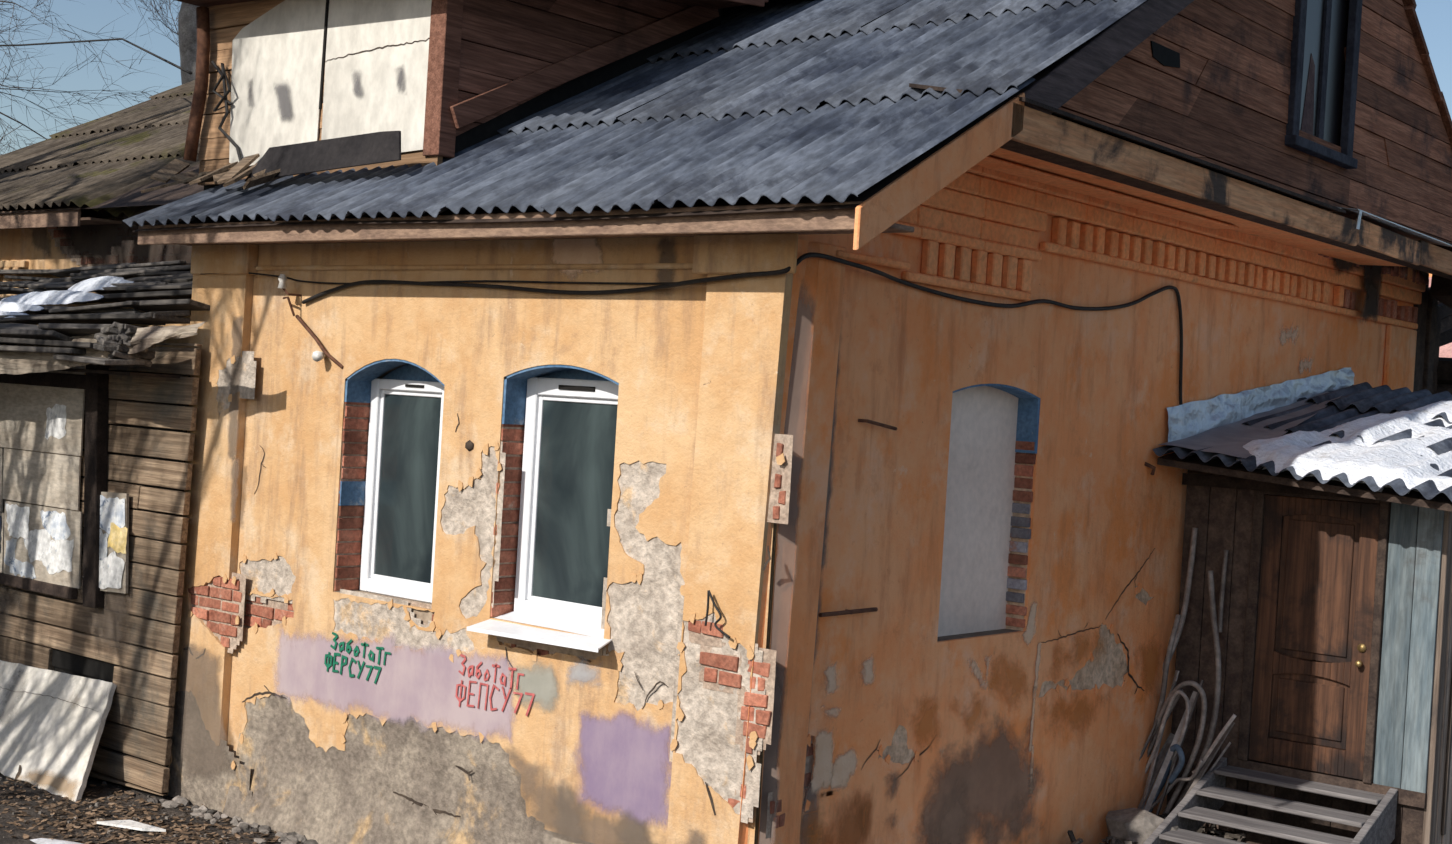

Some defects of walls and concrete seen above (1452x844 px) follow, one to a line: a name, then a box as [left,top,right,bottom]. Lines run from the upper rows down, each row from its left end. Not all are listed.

water stain [821,408,836,567]
flaking render [333,440,506,663]
spalling [188,552,296,654]
spalling [502,642,556,662]
flaking render [582,461,785,839]
flaking render [1038,624,1128,698]
flaking render [168,691,252,813]
spalling [803,734,814,811]
water stain [801,783,870,844]
peeling [831,749,857,788]
flaking render [878,725,920,764]
water stain [922,643,1041,844]